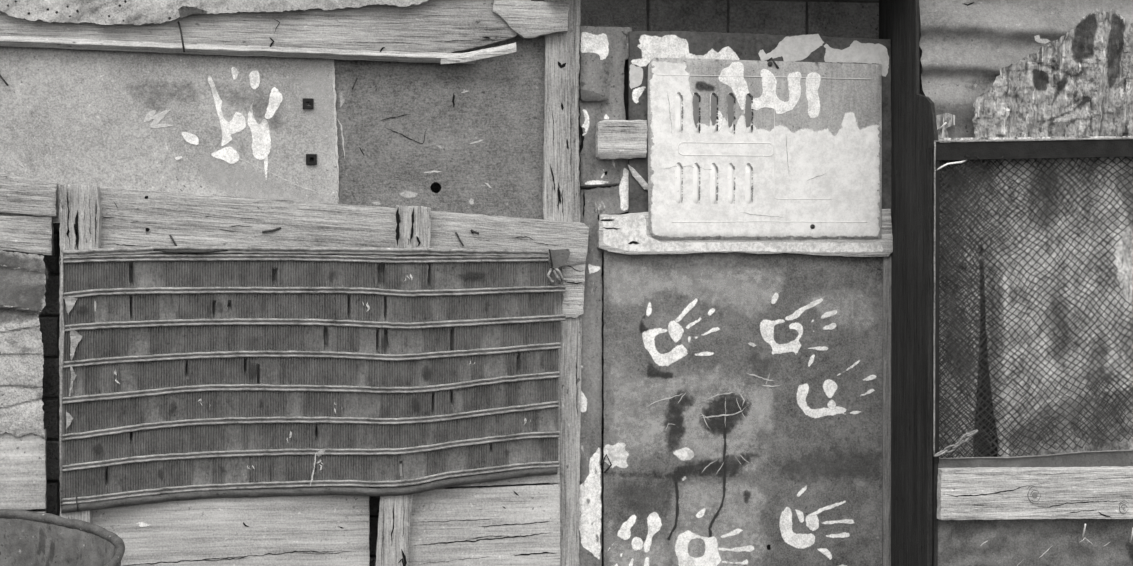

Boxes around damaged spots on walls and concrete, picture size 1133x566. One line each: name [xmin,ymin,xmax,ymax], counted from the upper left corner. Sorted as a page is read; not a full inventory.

peeling [580,32,609,60]
peeling [585,34,889,253]
crack [124,551,351,566]